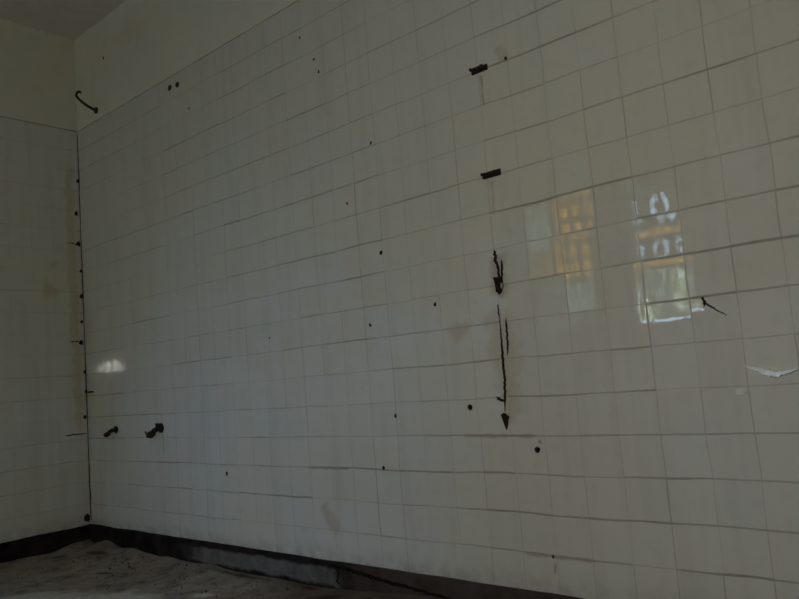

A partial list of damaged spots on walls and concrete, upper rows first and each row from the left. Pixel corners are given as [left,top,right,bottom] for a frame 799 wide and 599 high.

corrosion [436,298,543,445]